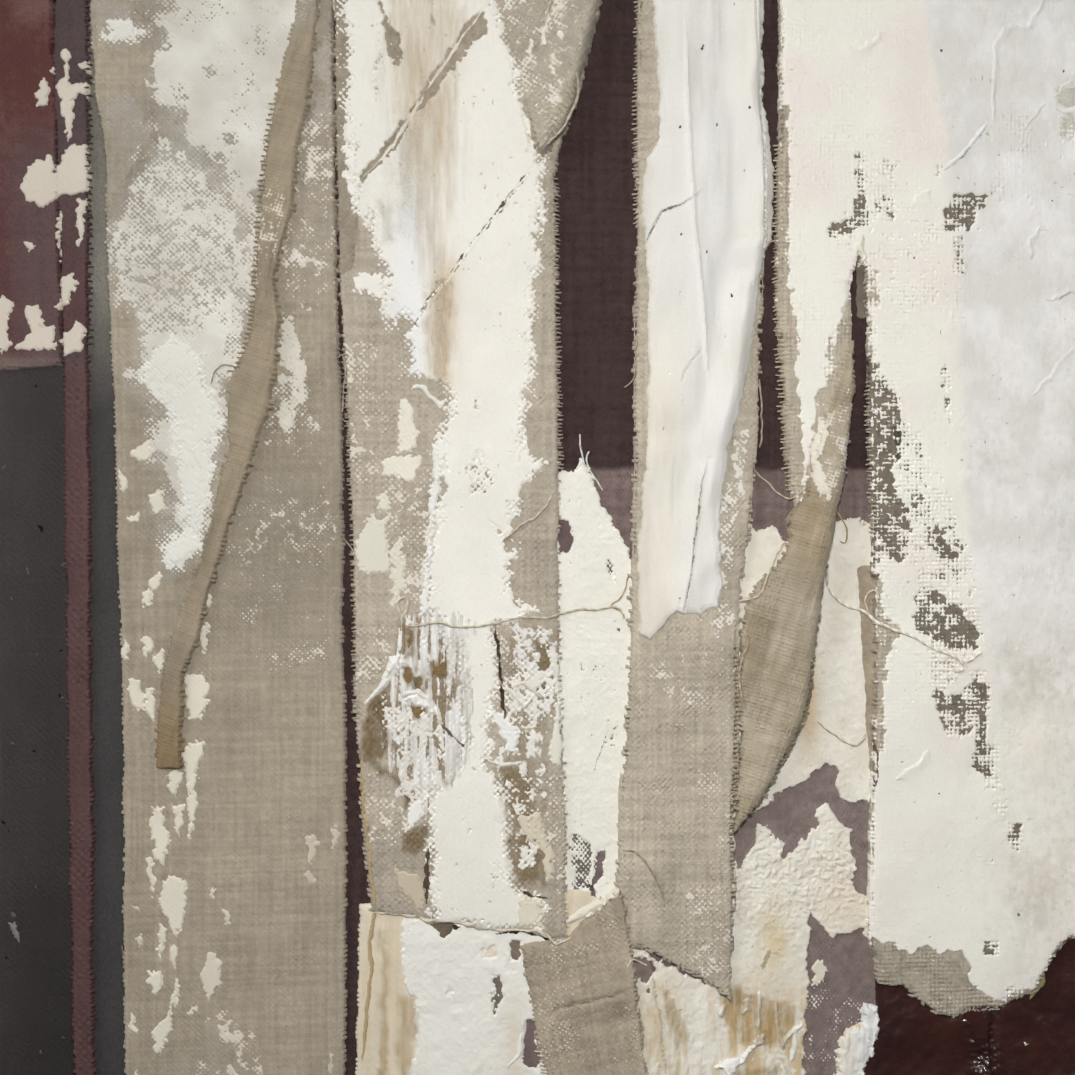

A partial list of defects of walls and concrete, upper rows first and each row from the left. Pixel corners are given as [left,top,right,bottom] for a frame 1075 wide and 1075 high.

peeling [20,49,92,311]
peeling [0,295,87,356]
peeling [808,385,852,507]
peeling [557,520,574,553]
peeling [127,678,156,722]
peeling [128,739,263,1075]
peeling [184,672,210,720]
peeling [365,692,459,847]
peeling [431,922,455,938]
peeling [487,620,617,1071]
spalling [682,759,869,978]
spalling [646,912,1013,1075]